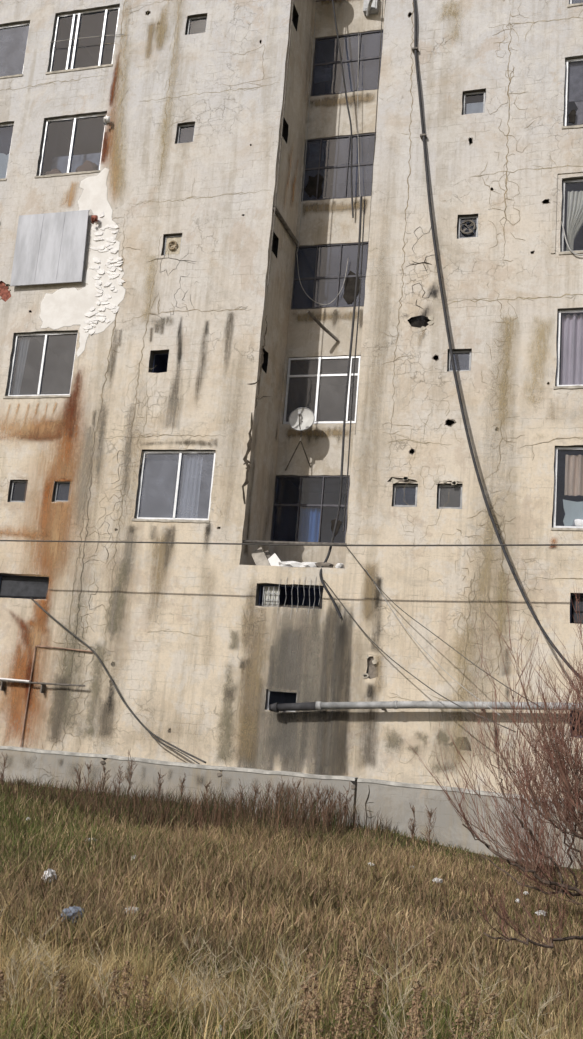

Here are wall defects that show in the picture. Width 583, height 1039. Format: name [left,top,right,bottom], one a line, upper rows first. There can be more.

corrosion [101,61,119,192]
spalling [0,281,11,302]
peeling [30,167,126,357]
crack [2,0,276,751]
damp [145,265,181,425]
crack [365,3,583,826]
corrosion [0,375,79,739]
damp [108,526,134,636]
damp [51,626,77,739]
damp [84,645,112,735]
damp [227,606,351,792]